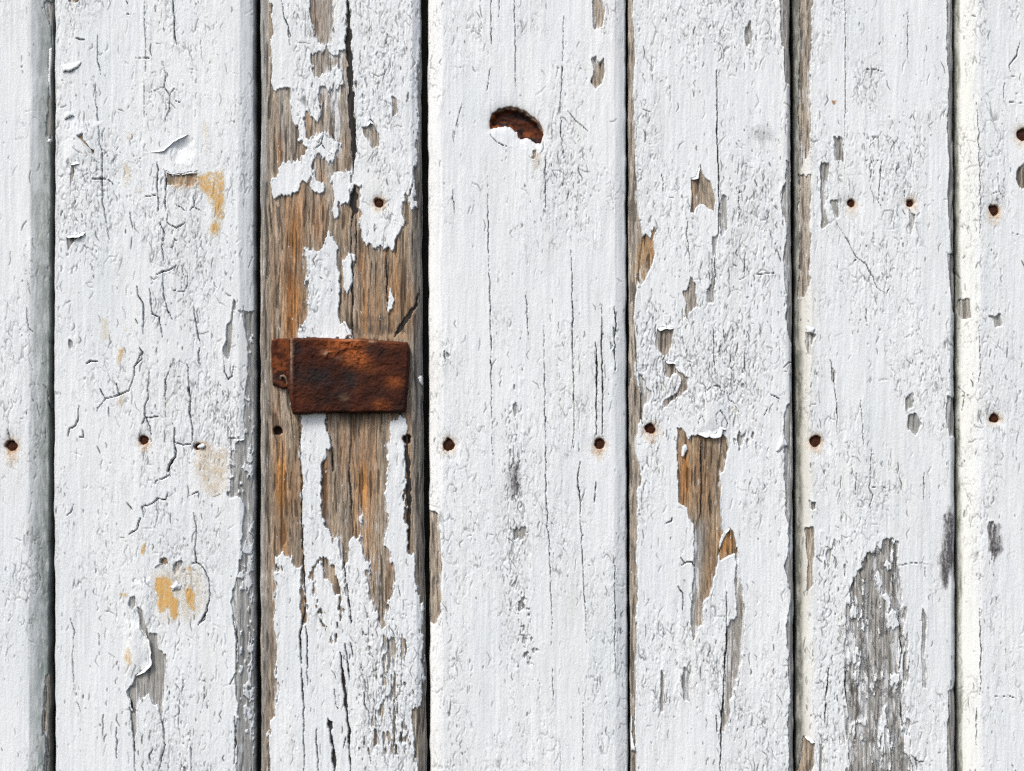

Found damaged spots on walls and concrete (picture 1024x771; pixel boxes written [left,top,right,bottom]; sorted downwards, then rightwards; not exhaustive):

peeling [150,134,199,187]
peeling [683,165,727,319]
crack [101,254,200,533]
peeling [223,0,442,771]
peeling [154,558,183,591]
peeling [677,426,754,731]
peeling [776,366,918,771]
peeling [127,596,166,738]
crack [117,701,180,762]